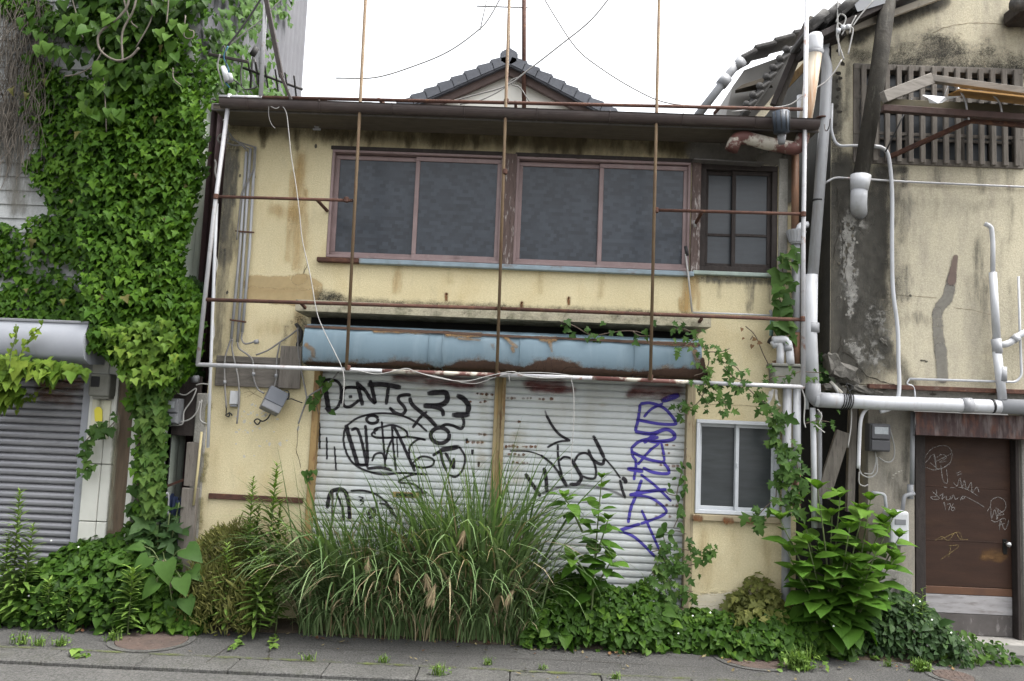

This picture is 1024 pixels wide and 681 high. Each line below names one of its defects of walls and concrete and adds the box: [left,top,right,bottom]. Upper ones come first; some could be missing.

mould [888,33,1024,69]
damp [230,126,791,205]
damp [215,144,239,352]
peeling [837,210,865,319]
corrosion [304,325,708,381]